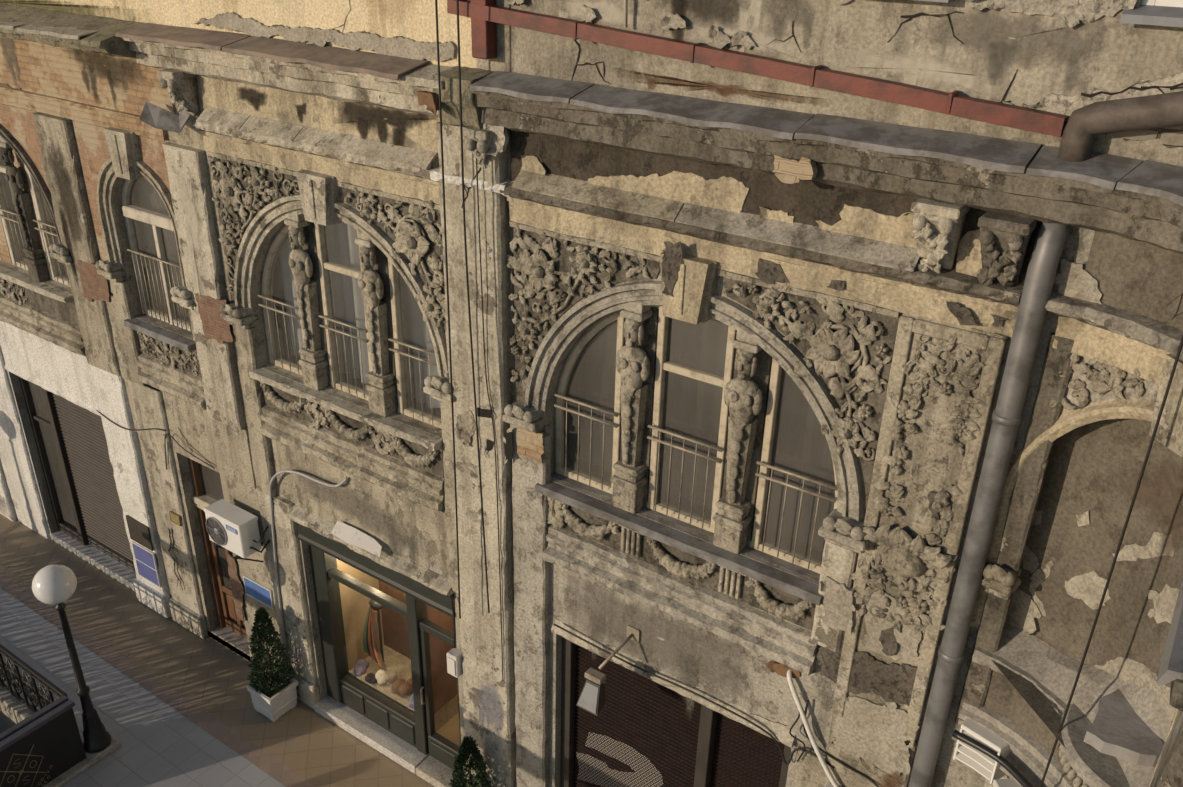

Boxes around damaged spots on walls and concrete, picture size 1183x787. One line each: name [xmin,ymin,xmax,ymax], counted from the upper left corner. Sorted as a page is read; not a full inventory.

crack [767,5,801,52]
crack [887,11,964,44]
flaking render [967,0,1137,29]
damp [73,49,136,103]
crack [571,40,611,84]
damp [340,101,428,146]
flaking render [773,155,818,184]
flaking render [587,171,750,213]
flaking render [816,204,917,248]
flaking render [1054,258,1103,304]
flaking render [1112,532,1175,561]
flaking render [1065,571,1111,610]